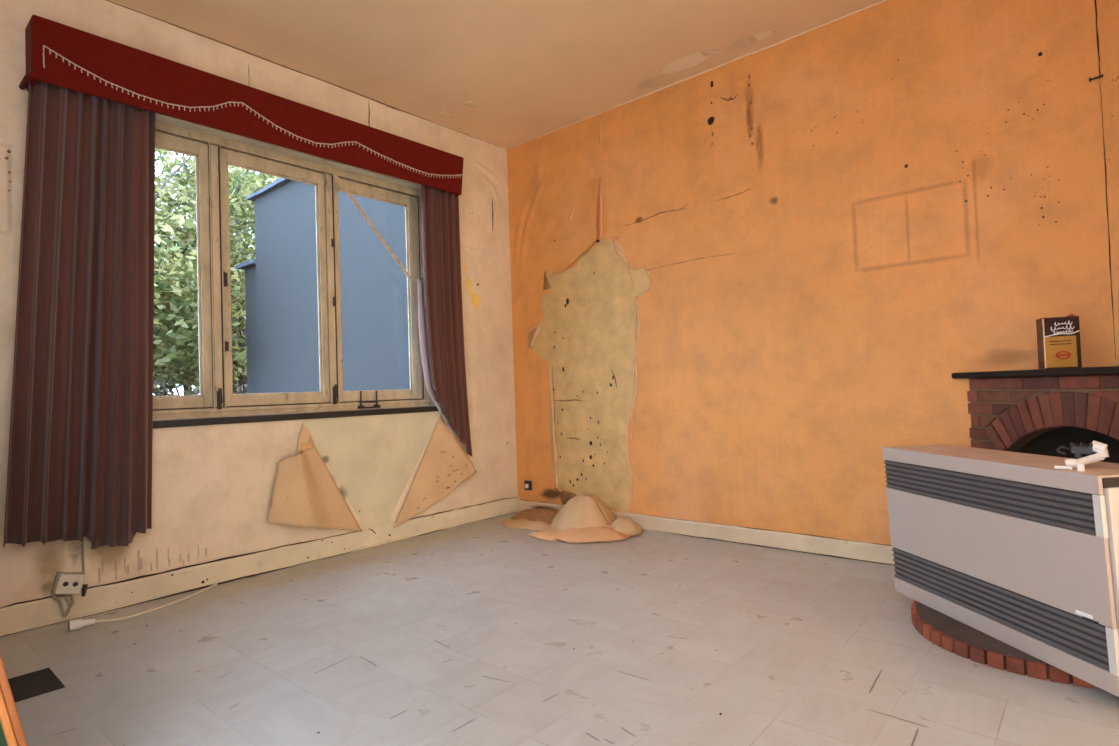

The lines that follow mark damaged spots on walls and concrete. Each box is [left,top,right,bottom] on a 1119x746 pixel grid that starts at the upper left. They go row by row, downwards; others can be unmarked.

flaking render [304,411,441,536]
flaking render [530,239,651,512]